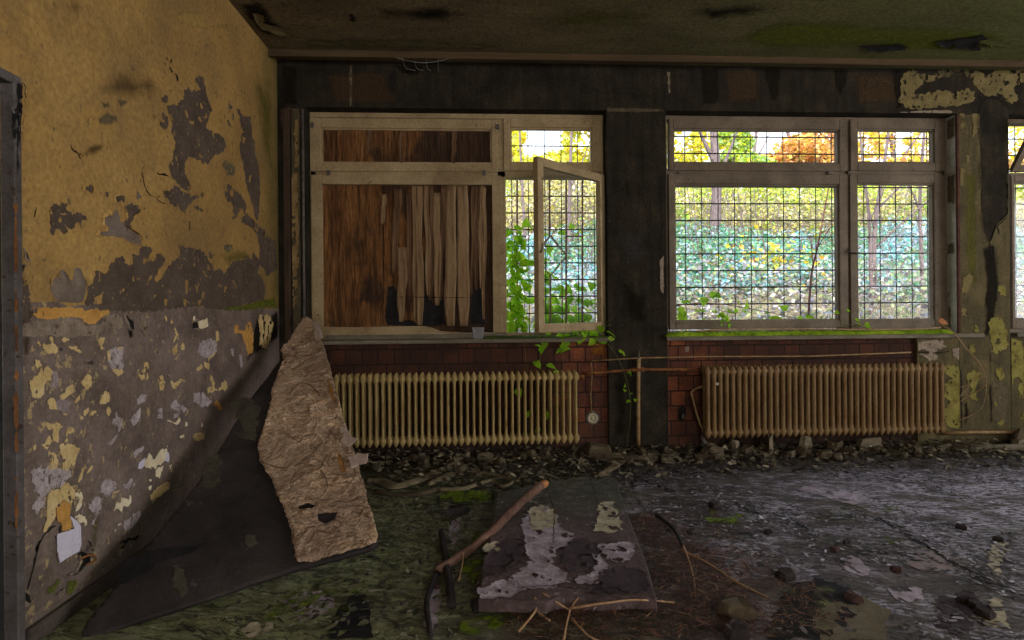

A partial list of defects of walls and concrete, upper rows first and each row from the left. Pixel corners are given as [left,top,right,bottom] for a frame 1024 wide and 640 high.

peeling [22,57,278,391]
peeling [35,384,98,420]
flaking render [57,514,97,576]